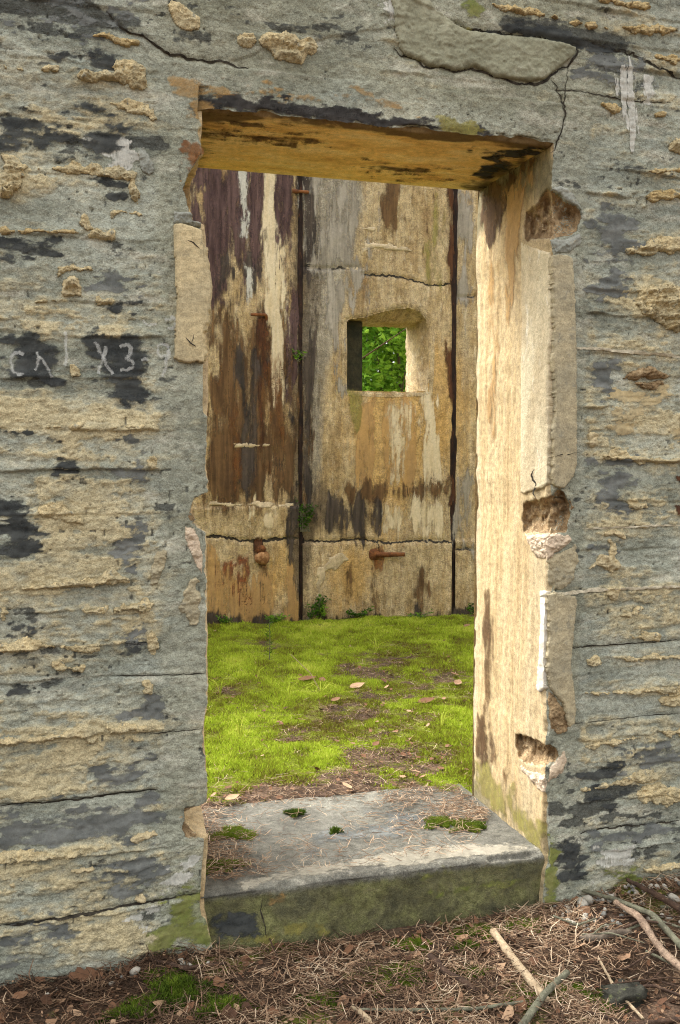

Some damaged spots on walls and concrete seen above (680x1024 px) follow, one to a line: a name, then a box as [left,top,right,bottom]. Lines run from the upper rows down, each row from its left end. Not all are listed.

crack [107,12,248,69]
crack [394,22,680,152]
damp [468,147,542,159]
crack [306,265,474,298]
damp [457,183,496,306]
spalling [524,186,582,253]
damp [190,167,475,593]
rust [206,537,299,623]
crack [206,534,475,551]
damp [414,565,431,617]
spalling [523,490,579,590]
spalling [516,692,568,793]